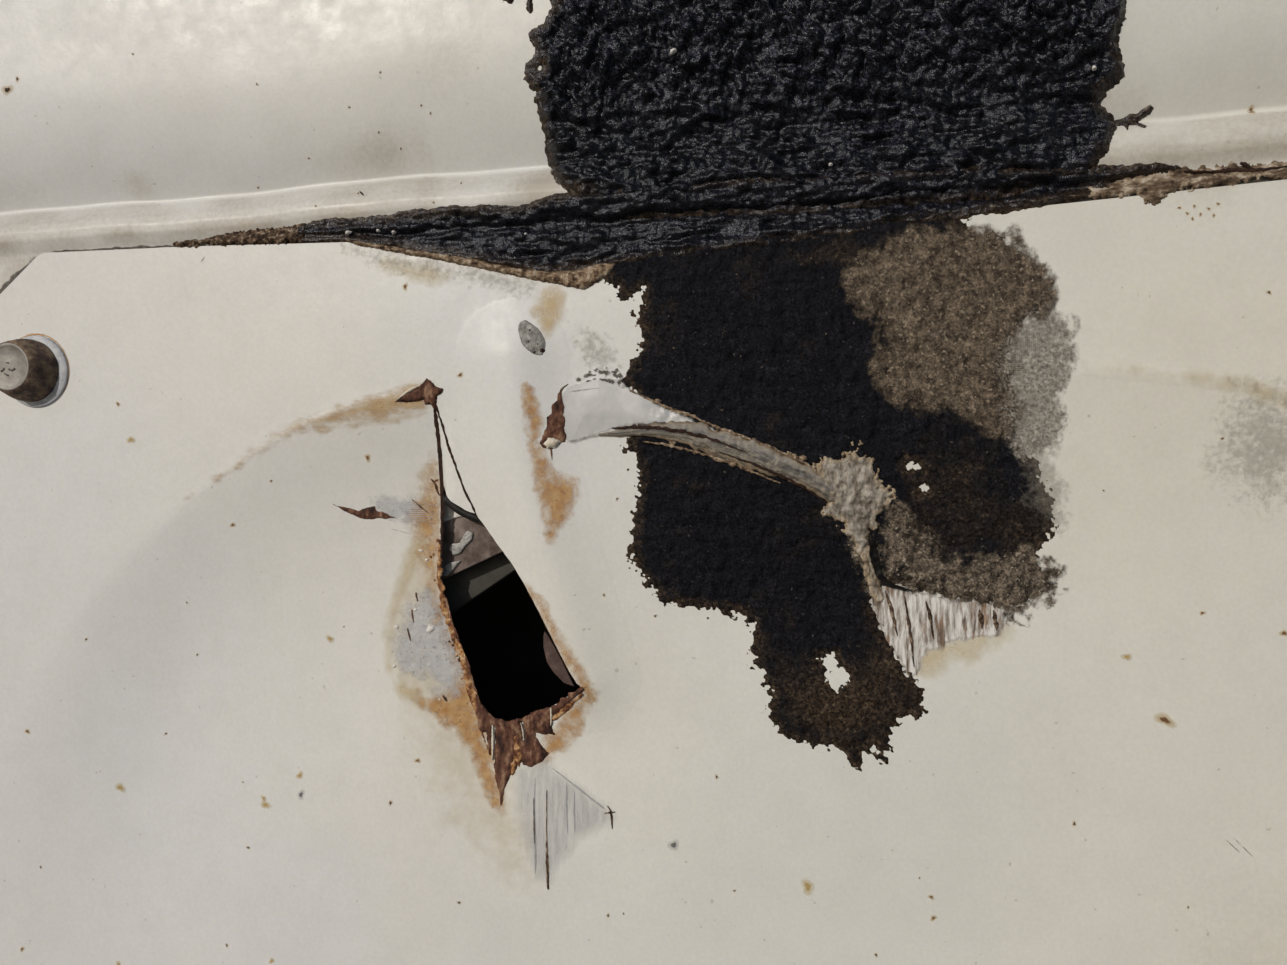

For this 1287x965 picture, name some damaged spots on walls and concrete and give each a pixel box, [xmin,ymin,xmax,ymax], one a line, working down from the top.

corrosion [320,378,444,432]
corrosion [524,384,572,538]
corrosion [333,483,588,806]